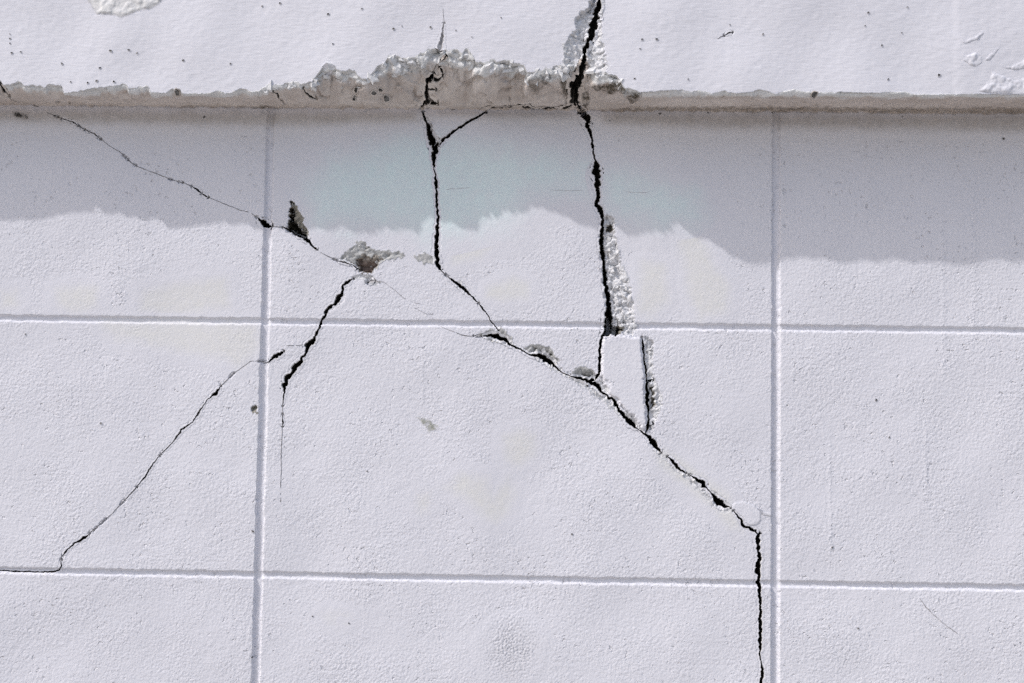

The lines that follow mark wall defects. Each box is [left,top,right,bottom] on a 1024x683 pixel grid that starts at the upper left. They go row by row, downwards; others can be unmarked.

spalling [0,0,1024,113]
flaking render [288,201,311,243]
flaking render [340,241,433,286]
crack [0,0,767,683]
flaking render [603,213,663,430]